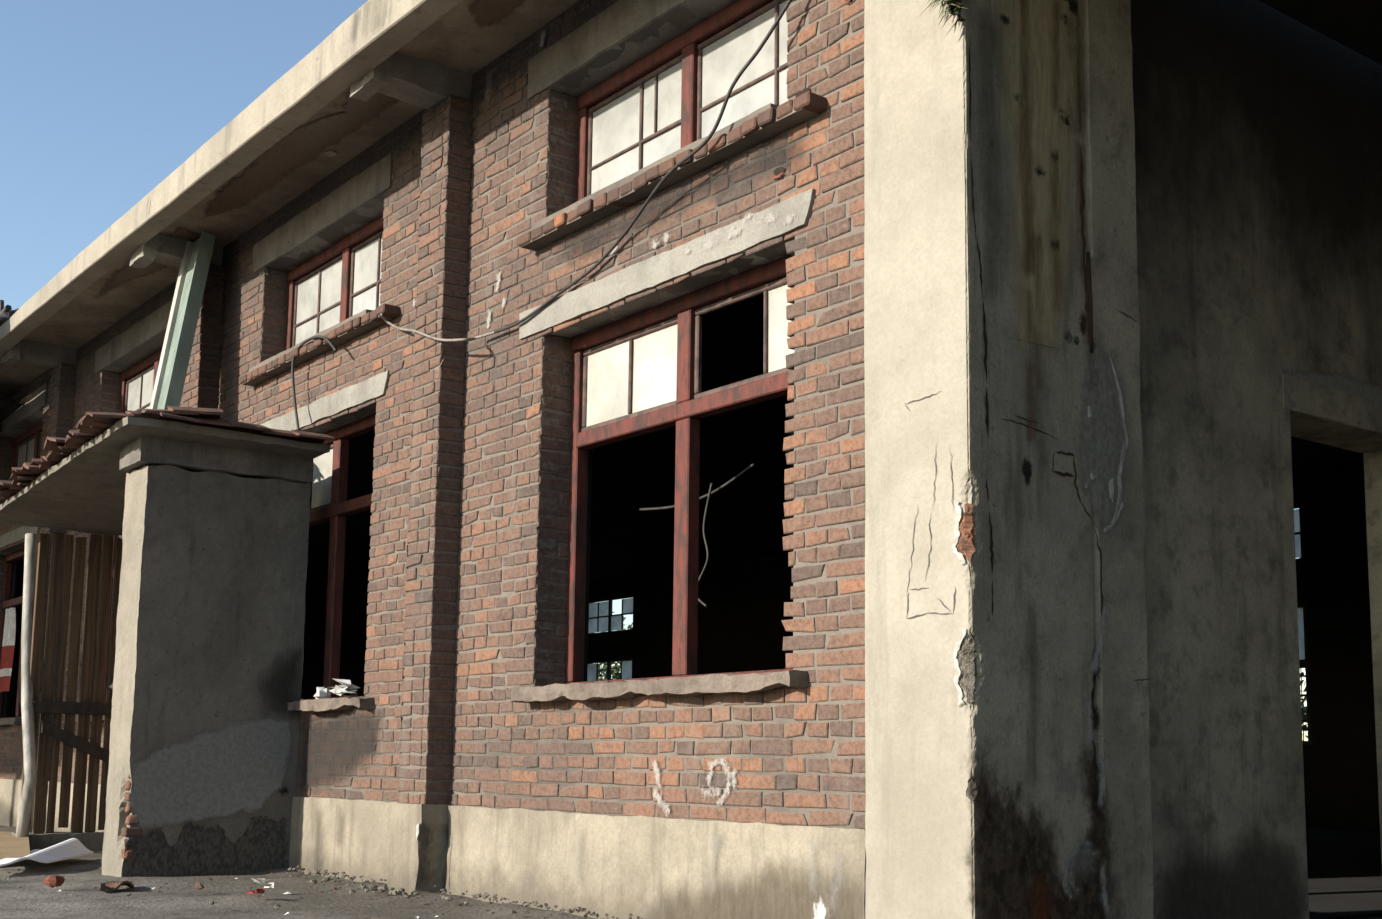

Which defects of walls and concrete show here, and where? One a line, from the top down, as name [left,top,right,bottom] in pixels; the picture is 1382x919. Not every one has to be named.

crack [969,0,1139,816]
spalling [952,501,976,565]
spalling [953,628,977,707]
spalling [121,774,287,877]
leakage [967,752,1114,919]